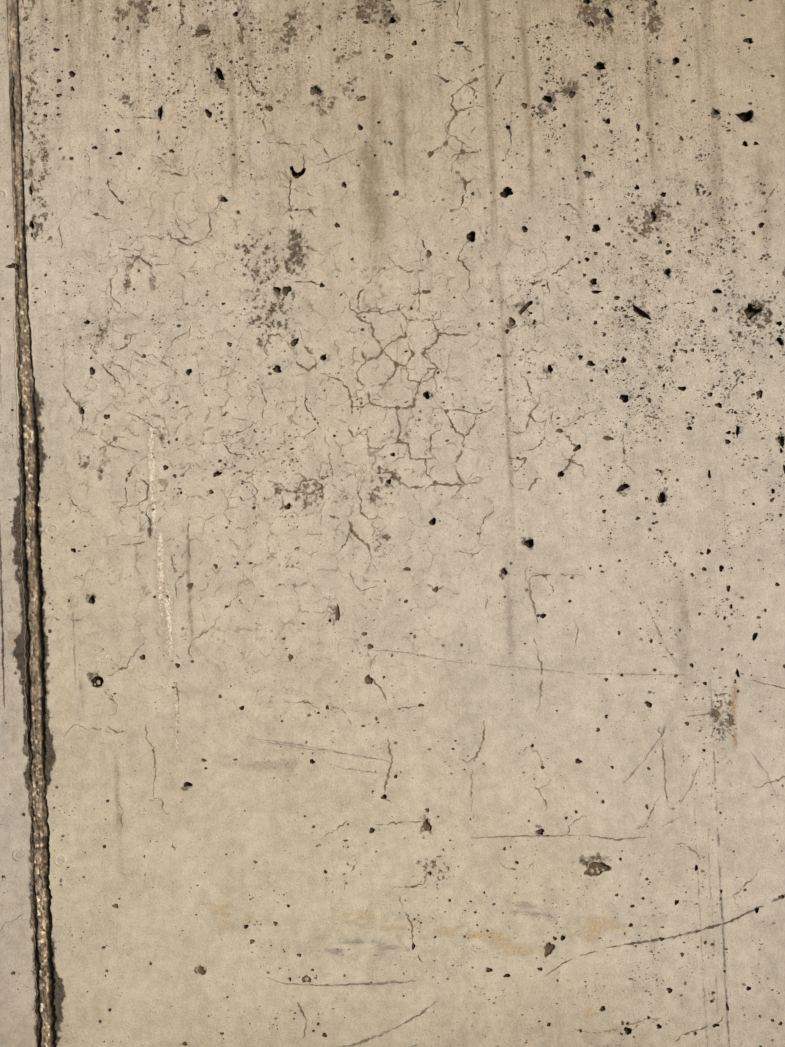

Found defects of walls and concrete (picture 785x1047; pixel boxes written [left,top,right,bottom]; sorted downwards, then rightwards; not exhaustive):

crack [240,16,353,249]
crack [424,46,506,210]
crack [110,204,219,306]
crack [63,384,87,436]
crack [92,327,191,428]
crack [222,389,267,457]
crack [233,240,494,559]
crack [509,371,603,490]
crack [99,436,154,545]